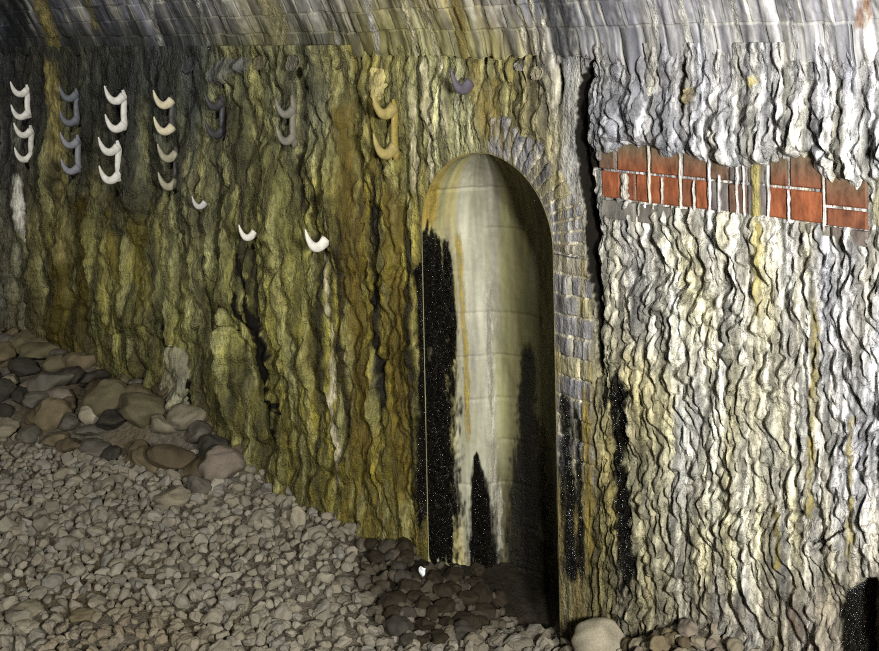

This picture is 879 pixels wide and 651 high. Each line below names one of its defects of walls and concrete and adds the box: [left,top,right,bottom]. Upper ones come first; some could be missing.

leakage [47,198,89,352]
leakage [297,154,320,242]
leakage [313,226,351,488]
leakage [357,178,385,406]
leakage [402,0,585,590]
spalling [599,144,869,247]
leakage [604,374,636,597]
leakage [840,577,878,651]